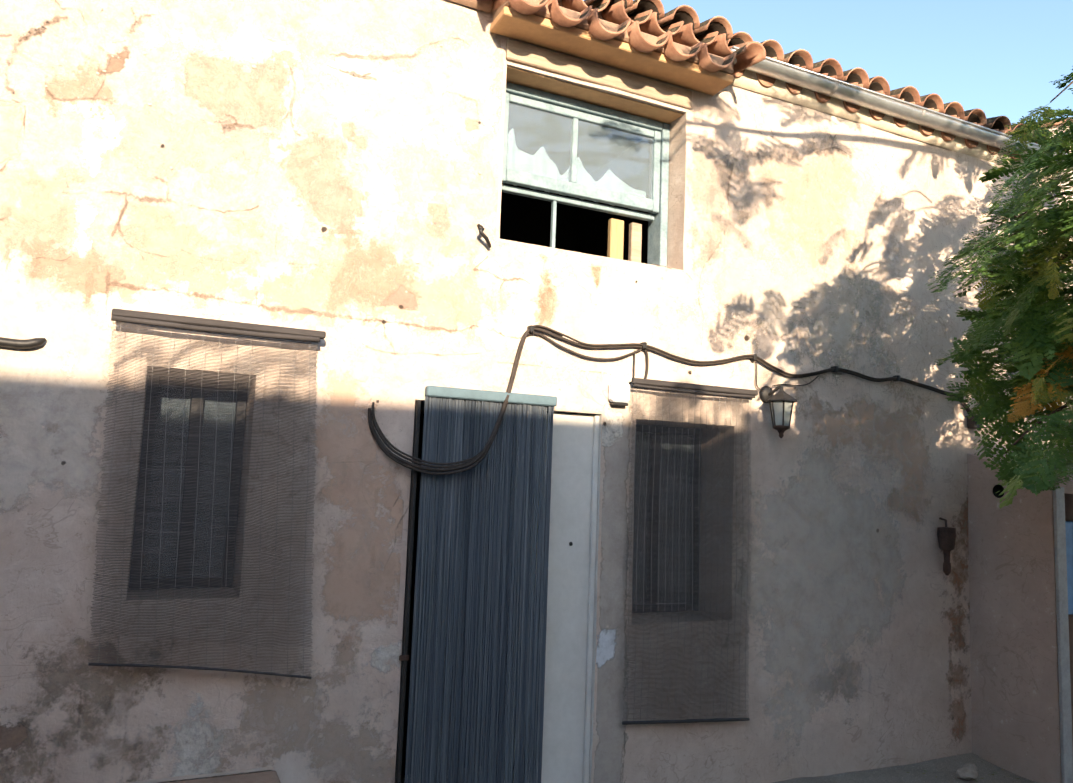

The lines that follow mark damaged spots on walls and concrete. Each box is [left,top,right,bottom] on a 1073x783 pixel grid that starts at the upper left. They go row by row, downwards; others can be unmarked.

flaking render [0,238,113,511]
crack [111,191,159,247]
flaking render [45,18,503,271]
flaking render [381,285,417,310]
damp [942,498,970,739]